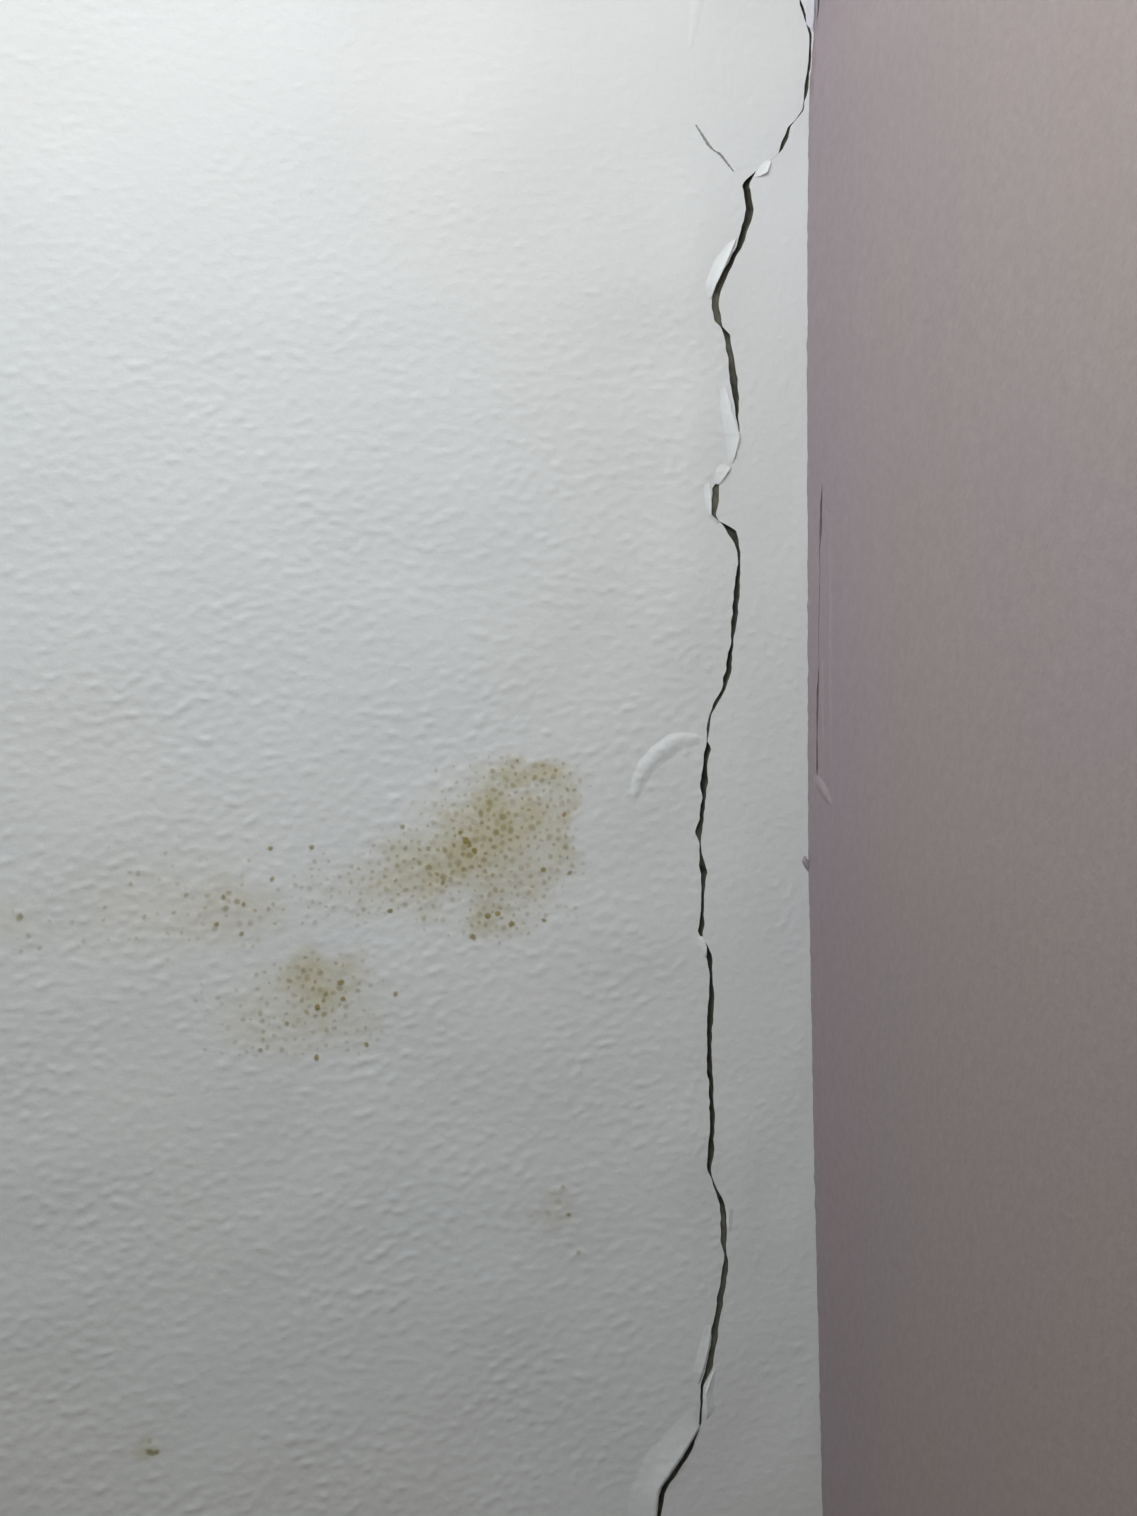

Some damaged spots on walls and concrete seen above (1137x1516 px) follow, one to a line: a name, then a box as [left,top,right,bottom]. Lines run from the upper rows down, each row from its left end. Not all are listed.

crack [627,0,820,1516]
crack [814,491,832,805]